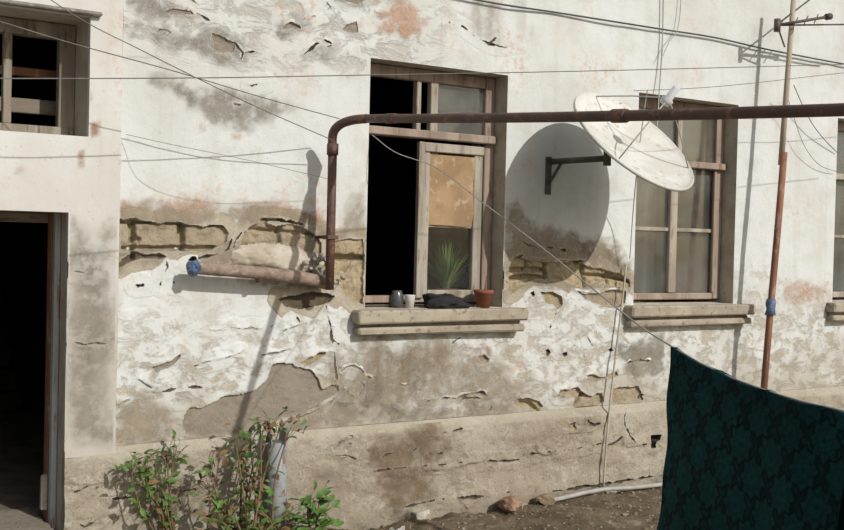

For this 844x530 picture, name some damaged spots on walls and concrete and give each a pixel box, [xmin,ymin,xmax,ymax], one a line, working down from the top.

spalling [151,0,244,67]
spalling [269,0,420,44]
spalling [503,253,634,318]
spalling [67,199,367,440]
flaking render [469,344,498,374]
spalling [505,324,645,413]
water stain [371,410,444,506]